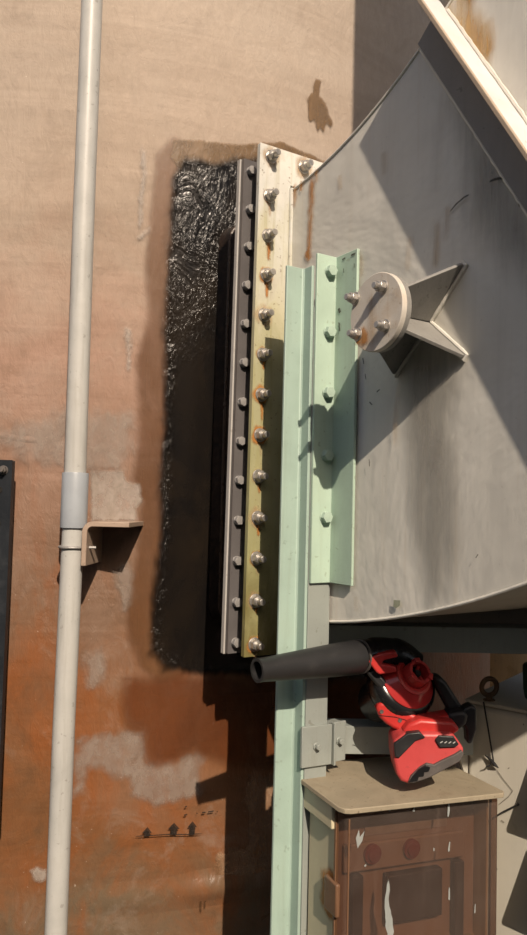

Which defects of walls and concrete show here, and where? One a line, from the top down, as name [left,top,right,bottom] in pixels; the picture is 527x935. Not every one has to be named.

rust [461,0,490,56]
leakage [308,79,332,132]
rust [294,158,314,260]